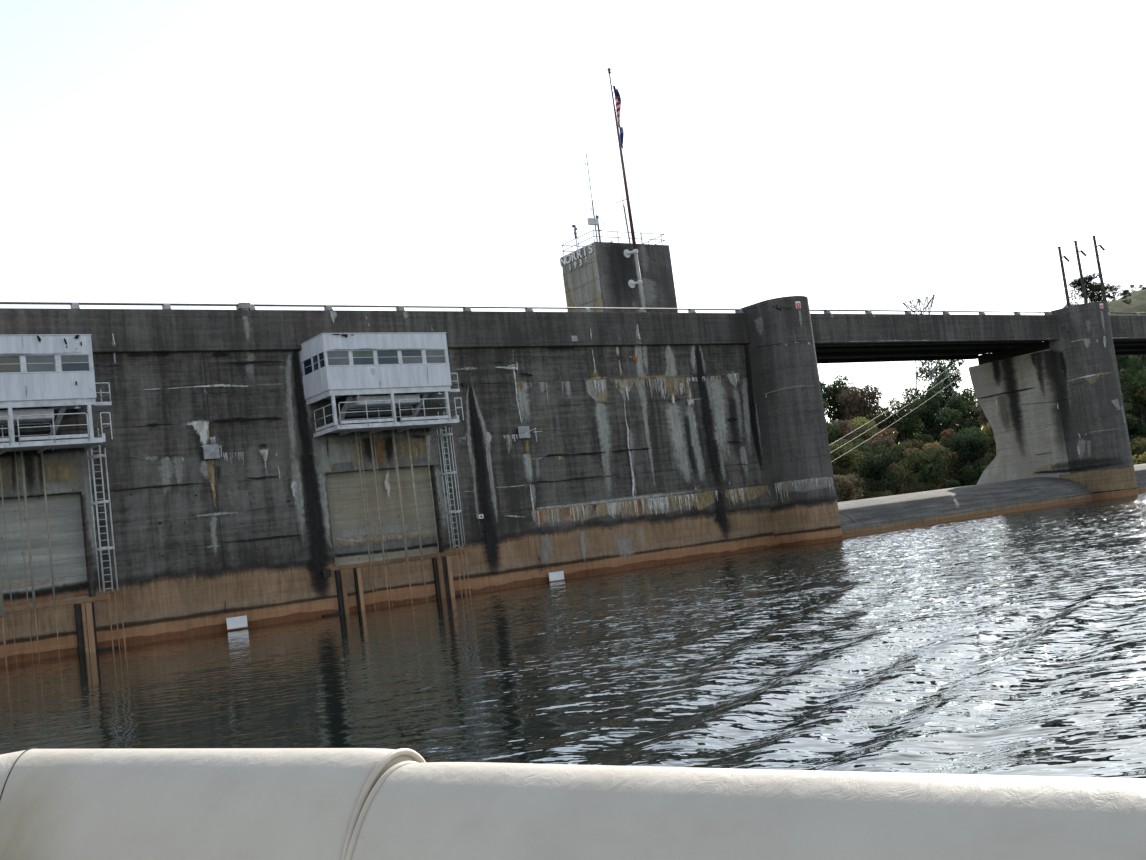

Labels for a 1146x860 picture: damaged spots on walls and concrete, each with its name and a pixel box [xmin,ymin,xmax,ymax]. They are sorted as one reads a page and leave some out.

leakage [459,324,833,571]
leakage [992,355,1022,441]
rust [0,459,1146,666]